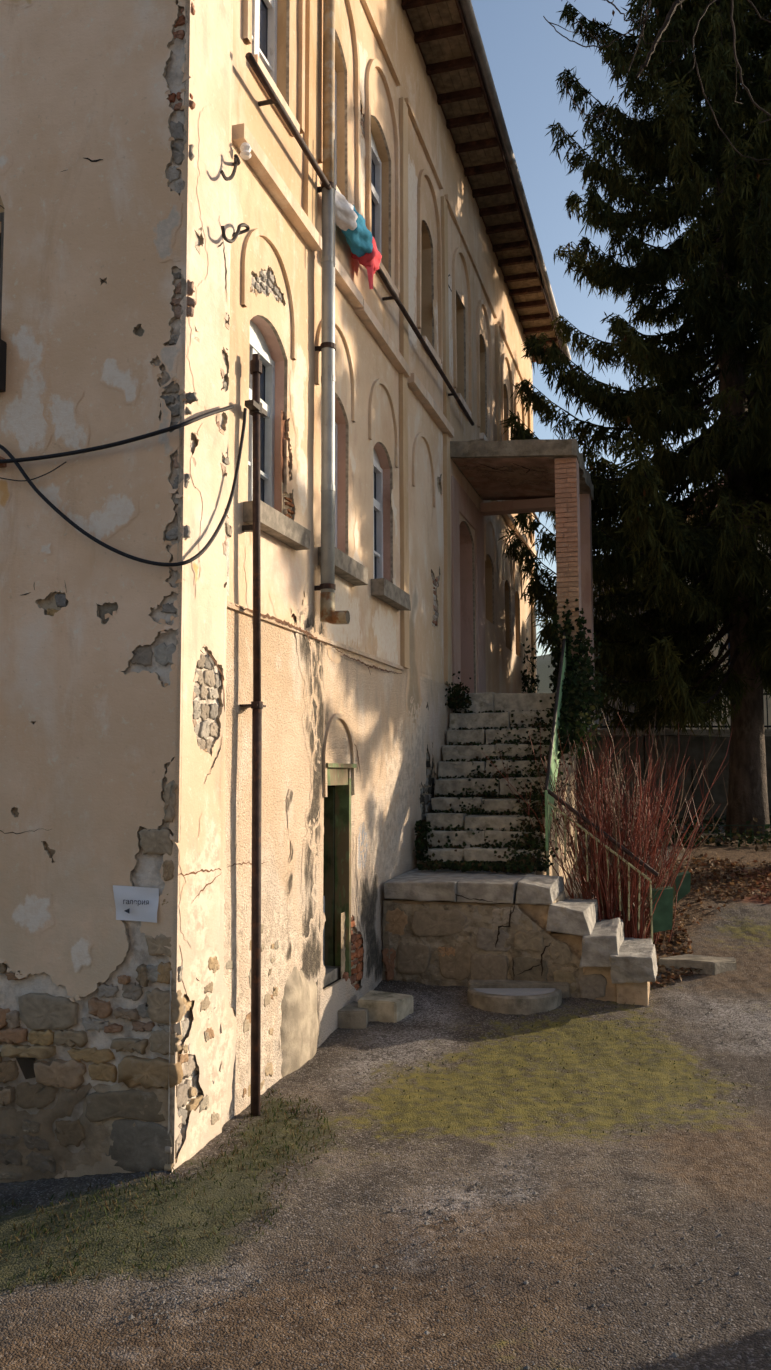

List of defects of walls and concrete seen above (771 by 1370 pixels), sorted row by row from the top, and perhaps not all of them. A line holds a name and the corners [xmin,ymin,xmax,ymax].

peeling [0,319,90,459]
peeling [94,356,141,407]
peeling [123,0,402,687]
peeling [36,477,139,545]
spalling [38,593,69,616]
spalling [99,603,118,624]
spalling [192,648,226,753]
damp [285,603,330,1047]
flaking render [0,763,303,1183]
spalling [341,912,368,990]